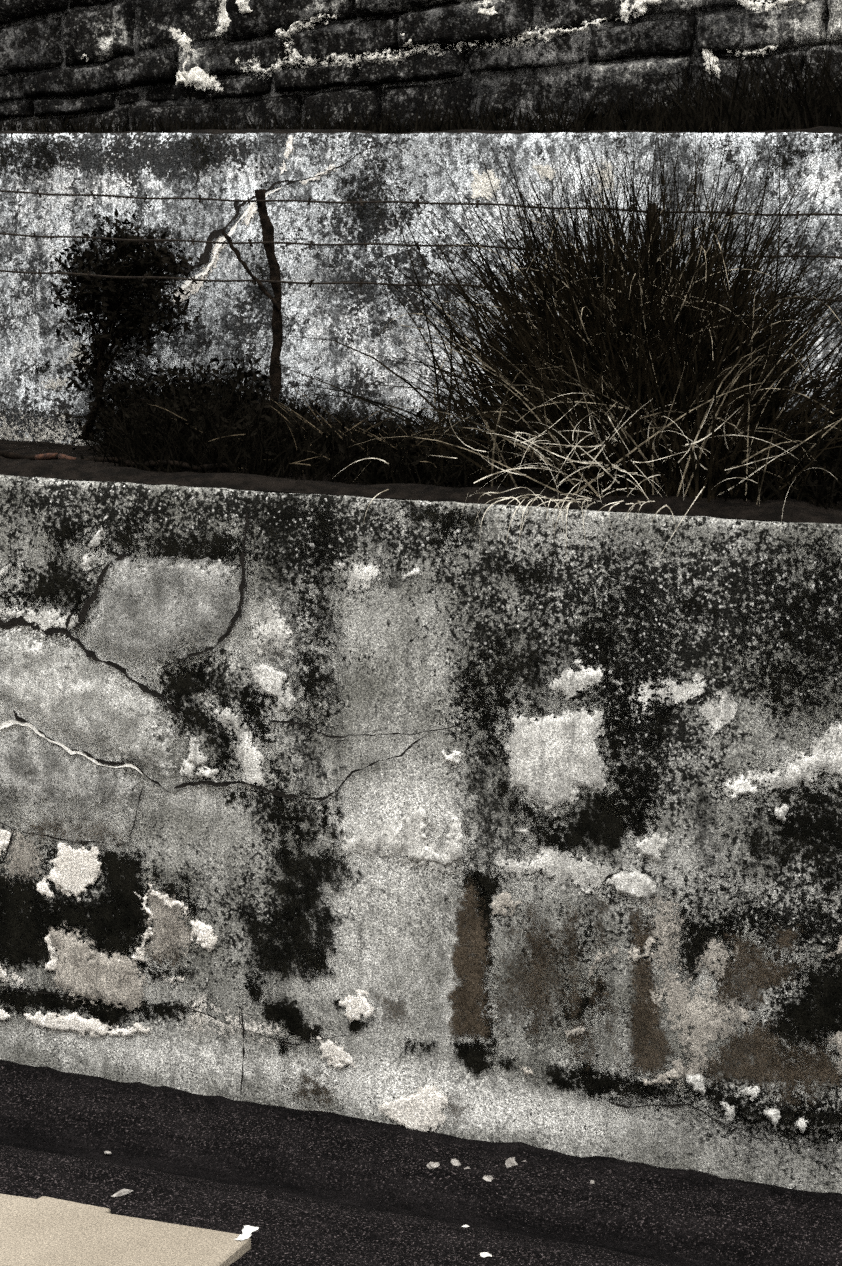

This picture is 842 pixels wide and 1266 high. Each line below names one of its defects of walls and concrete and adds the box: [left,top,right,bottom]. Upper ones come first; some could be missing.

crack [178,142,386,290]
crack [0,510,250,720]
leakage [0,492,363,1056]
crack [0,710,461,864]
leakage [404,524,842,1149]
leakage [298,1075,331,1105]